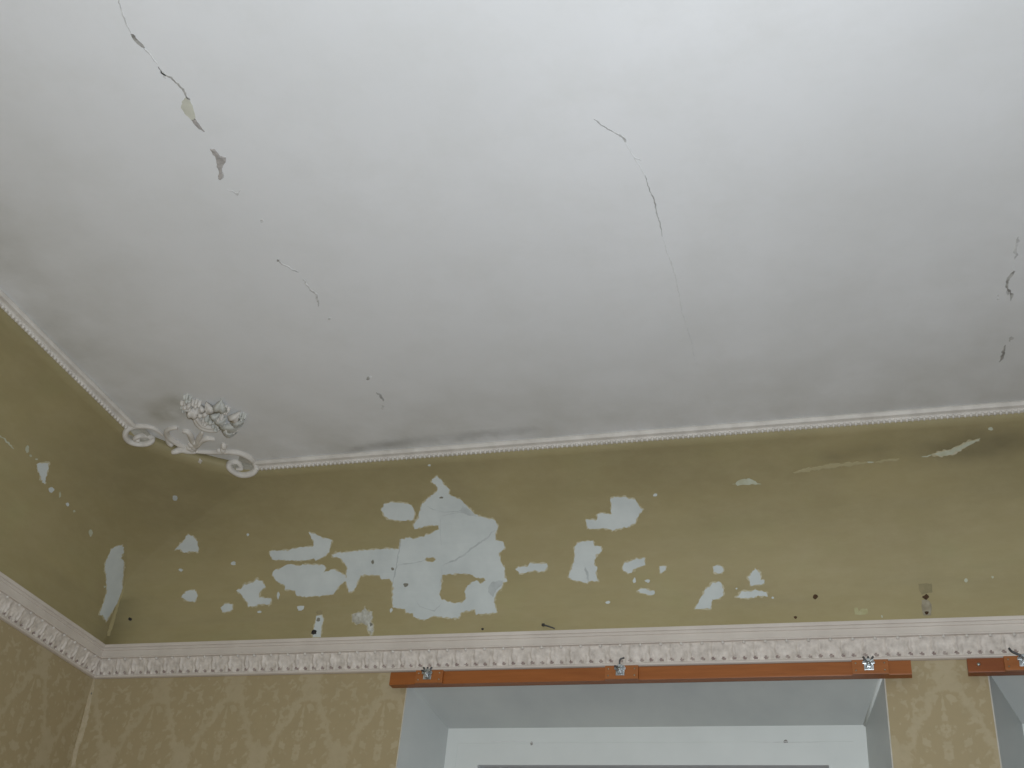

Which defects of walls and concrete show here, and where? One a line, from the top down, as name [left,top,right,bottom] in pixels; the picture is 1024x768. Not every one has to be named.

crack [118,0,240,196]
crack [594,119,697,366]
crack [997,237,1020,301]
crack [999,337,1014,362]
peeling [0,436,76,512]
peeling [98,544,126,622]
peeling [175,533,199,554]
peeling [220,464,548,630]
peeling [567,495,644,584]
peeling [622,557,667,596]
peeling [694,564,774,610]